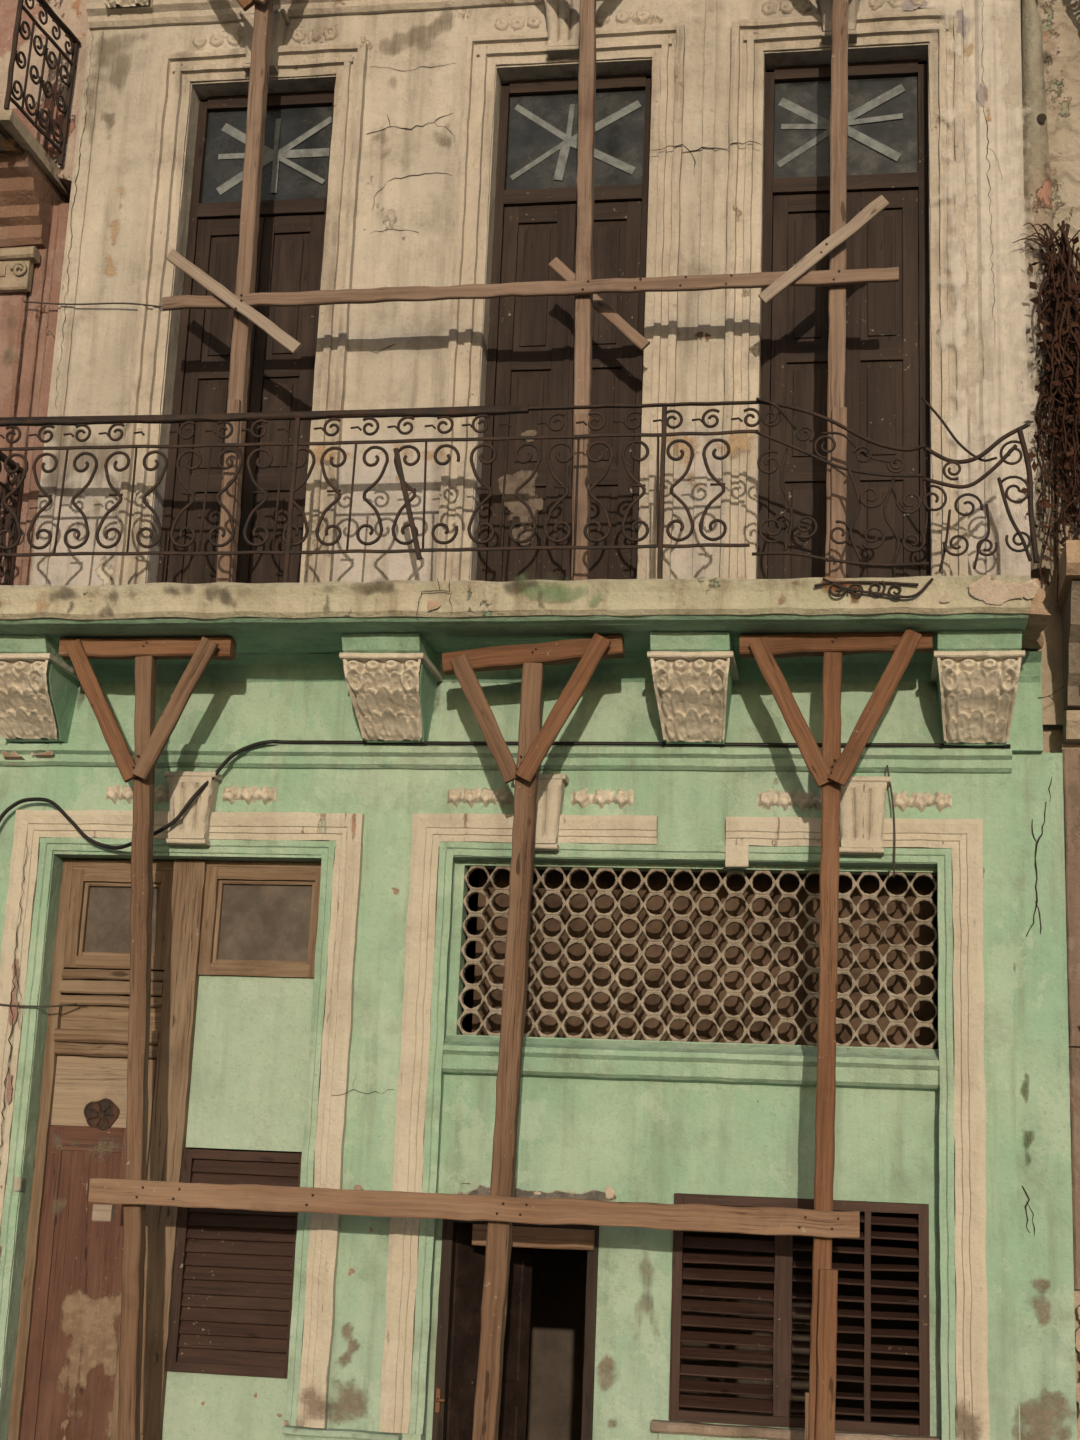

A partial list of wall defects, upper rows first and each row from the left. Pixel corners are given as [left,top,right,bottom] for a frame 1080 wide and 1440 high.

peeling [0,0,46,57]
crack [367,113,455,233]
crack [655,141,761,168]
peeling [968,575,1039,605]
crack [1026,778,1052,937]
peeling [1034,1280,1050,1324]
water stain [340,1324,359,1364]
water stain [302,1385,365,1421]
peeling [955,1406,980,1440]
peeling [1013,1383,1080,1440]